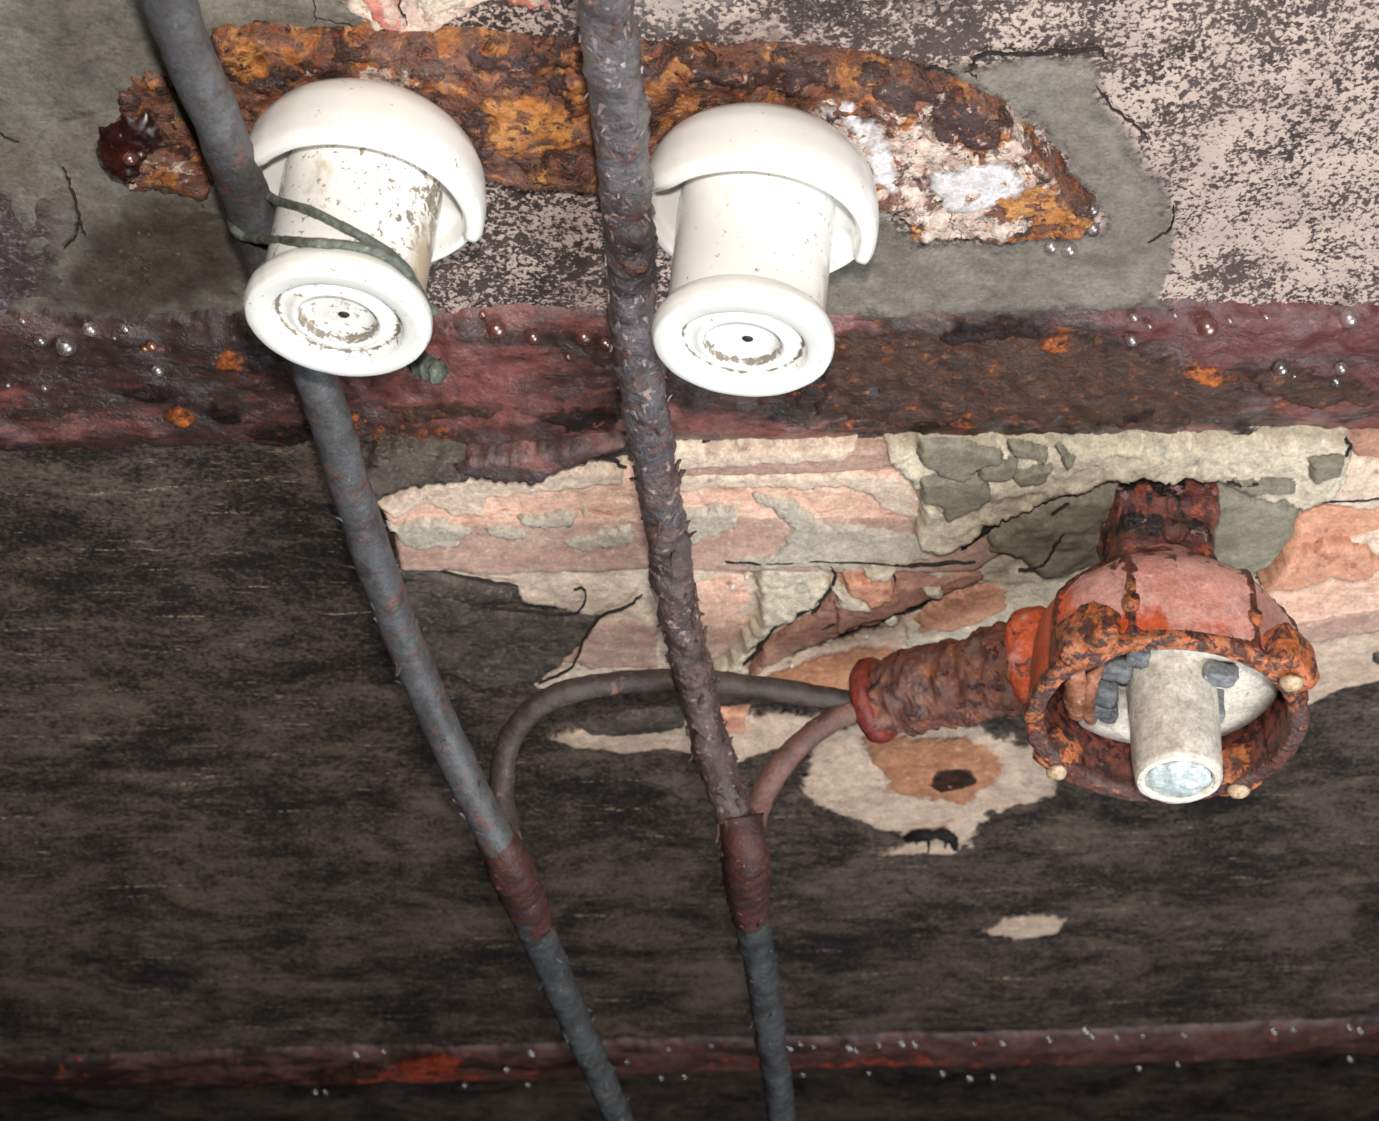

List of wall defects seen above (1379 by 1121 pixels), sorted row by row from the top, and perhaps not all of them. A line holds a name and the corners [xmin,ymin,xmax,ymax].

crack [398,0,408,25]
peeling [344,0,488,34]
rust [96,68,215,208]
rust [483,94,583,185]
rust [852,79,1001,156]
rust [995,173,1094,231]
rust [815,320,1379,436]
flaking render [377,431,671,689]
flaking render [674,425,1379,705]
flaking render [550,707,691,754]
flaking render [721,704,822,763]
flaking render [798,724,1056,856]